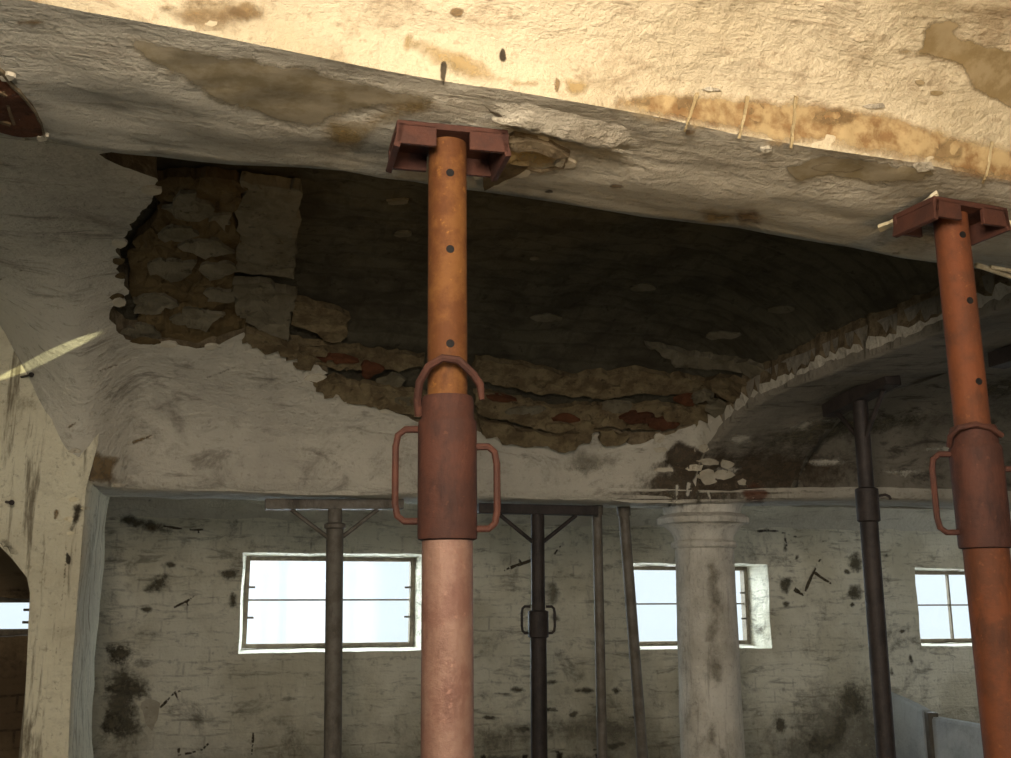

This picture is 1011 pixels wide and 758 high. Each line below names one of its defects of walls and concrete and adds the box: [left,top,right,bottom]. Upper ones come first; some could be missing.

peeling [899,12,1011,108]
flaking render [618,87,1011,184]
flaking render [99,152,428,422]
flaking render [467,131,942,503]
flaking render [974,268,1011,296]
damp [103,646,148,743]
damp [791,687,876,758]